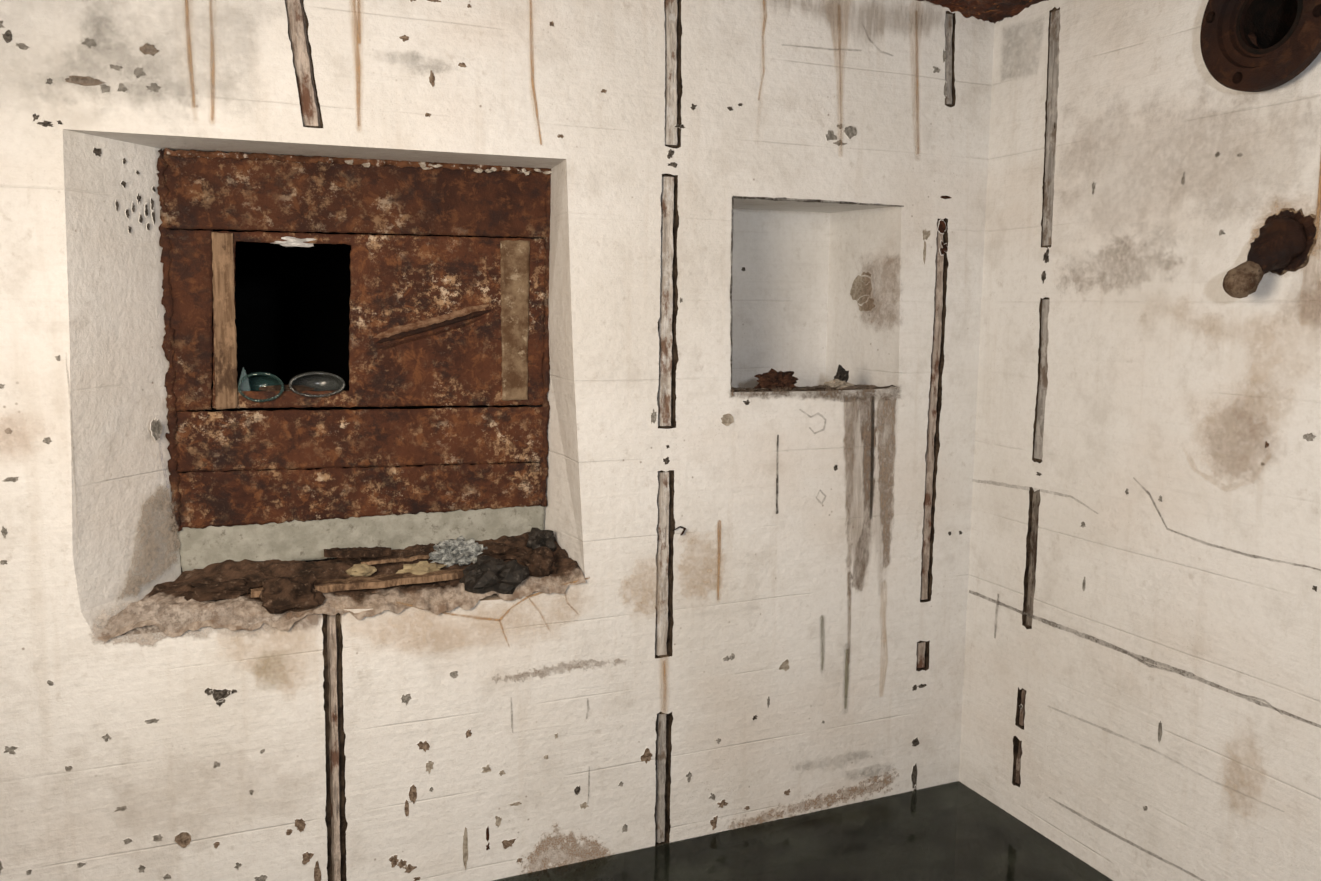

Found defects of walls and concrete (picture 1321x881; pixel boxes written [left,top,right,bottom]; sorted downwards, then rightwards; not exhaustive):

peeling [667,149,678,168]
peeling [922,219,948,265]
peeling [1041,247,1050,285]
corrosion [157,148,182,531]
corrosion [539,174,551,507]
peeling [94,484,224,645]
peeling [240,611,320,631]
leakage [731,387,899,663]
crack [969,590,1317,726]